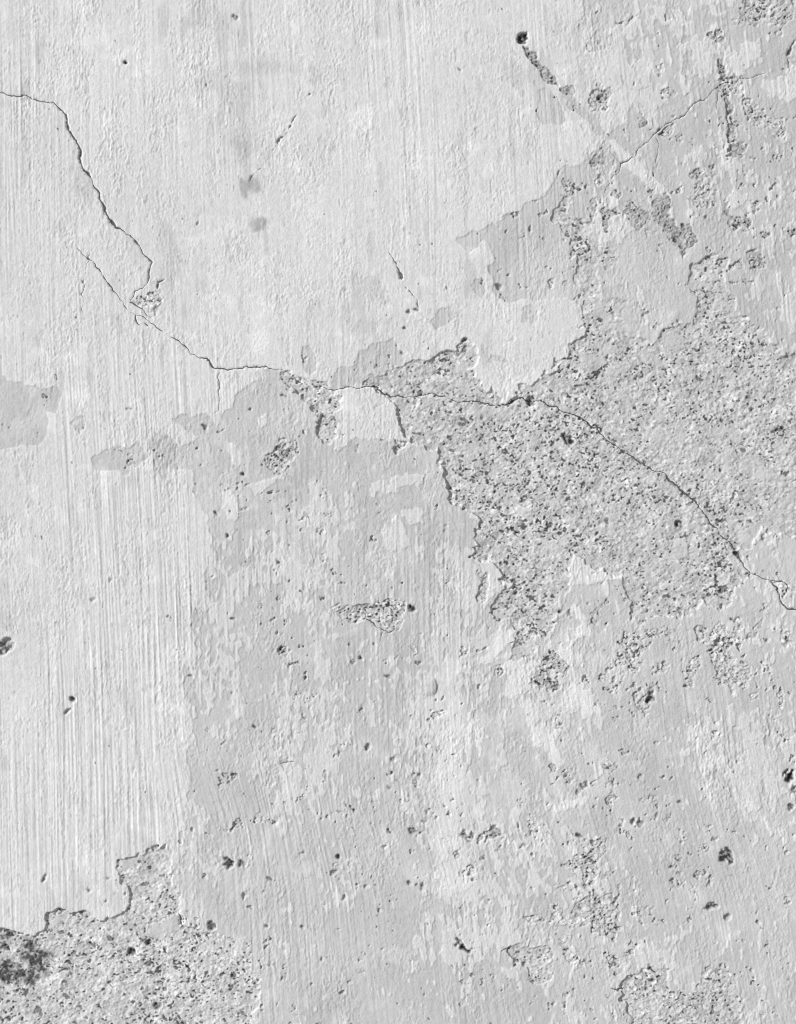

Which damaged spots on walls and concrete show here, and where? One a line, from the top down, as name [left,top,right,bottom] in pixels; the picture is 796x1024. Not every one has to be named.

peeling [302,345,318,376]
crack [0,92,796,610]
spalling [333,0,796,662]
crack [604,41,795,193]
peeling [0,369,796,1024]